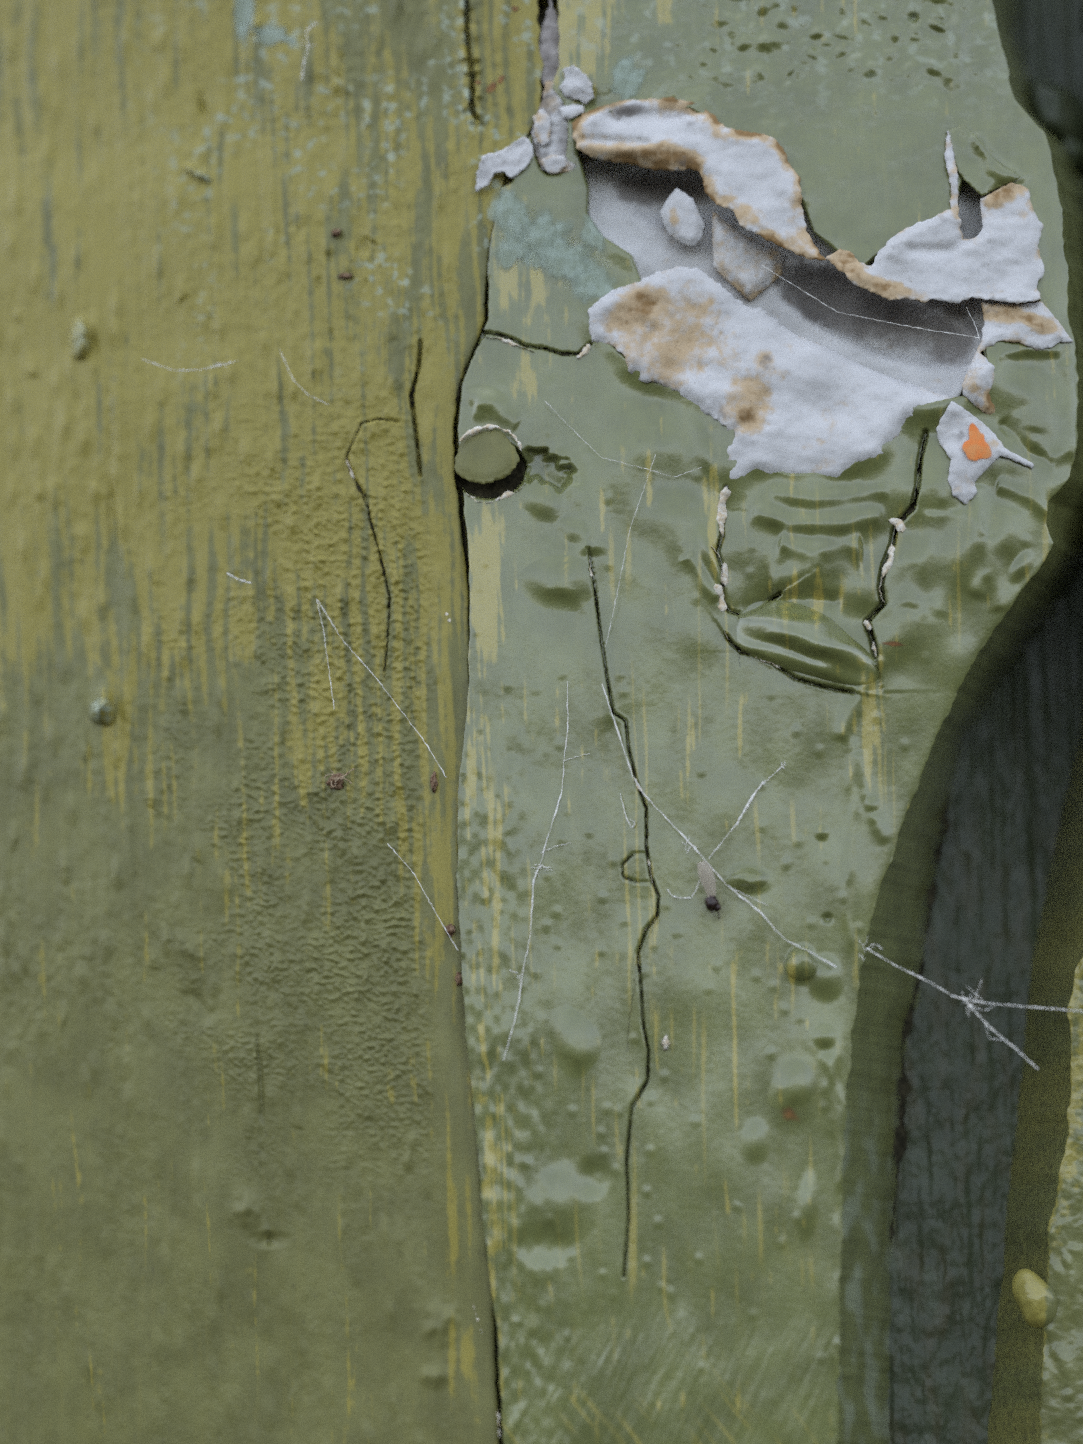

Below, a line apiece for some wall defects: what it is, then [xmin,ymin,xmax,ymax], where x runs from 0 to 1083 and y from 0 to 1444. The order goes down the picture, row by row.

crack [465,0,475,116]
crack [537,0,560,87]
peeling [475,65,1073,504]
crack [346,341,421,671]
crack [445,290,591,634]
crack [711,487,852,692]
crack [863,432,926,656]
crack [589,550,659,1259]